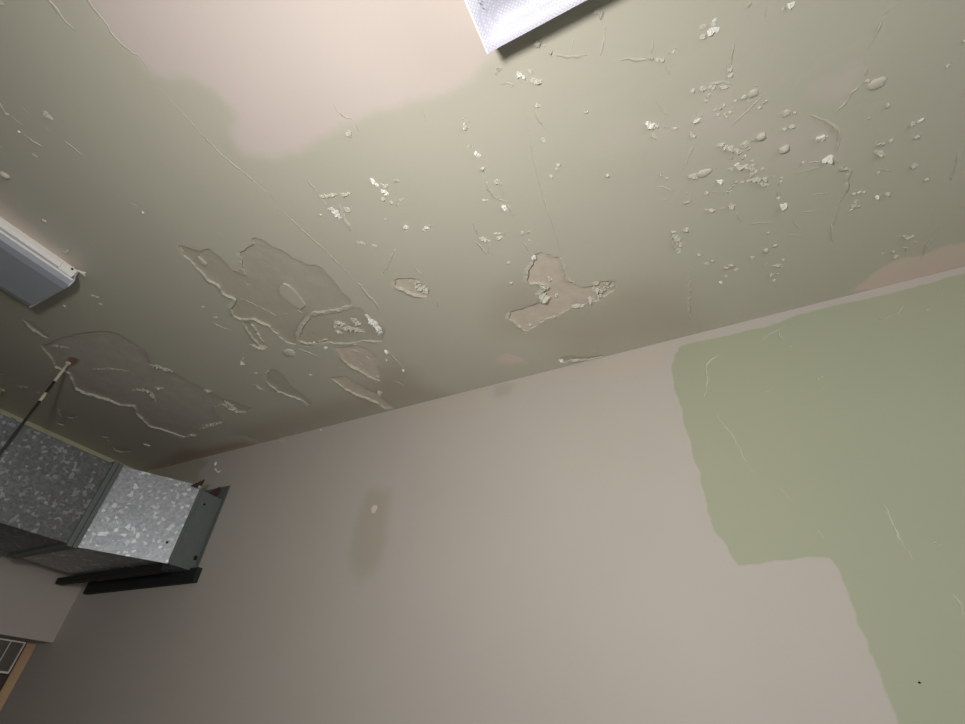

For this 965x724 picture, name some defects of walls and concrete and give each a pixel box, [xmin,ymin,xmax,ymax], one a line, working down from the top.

peeling [645,121,679,141]
peeling [307,179,351,231]
peeling [370,178,414,231]
peeling [467,144,514,217]
peeling [686,142,787,212]
peeling [175,238,404,410]
peeling [390,278,430,301]
peeling [505,230,616,334]
peeling [20,319,251,439]
damp [337,477,403,596]